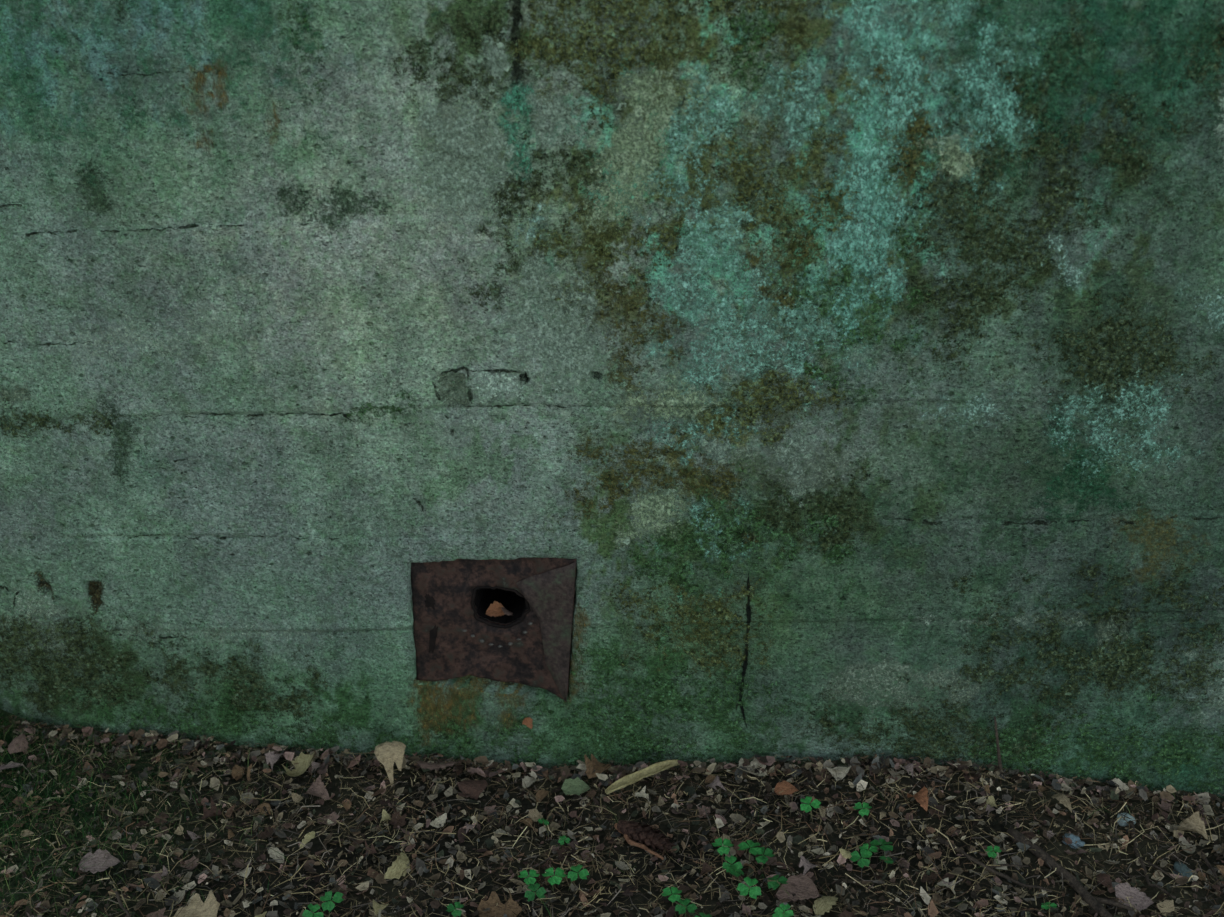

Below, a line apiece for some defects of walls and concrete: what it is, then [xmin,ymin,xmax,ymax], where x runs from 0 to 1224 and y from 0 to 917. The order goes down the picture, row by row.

crack [510,0,523,106]
leakage [425,365,524,461]
spalling [31,572,56,600]
spalling [86,581,104,614]
crack [736,572,751,730]